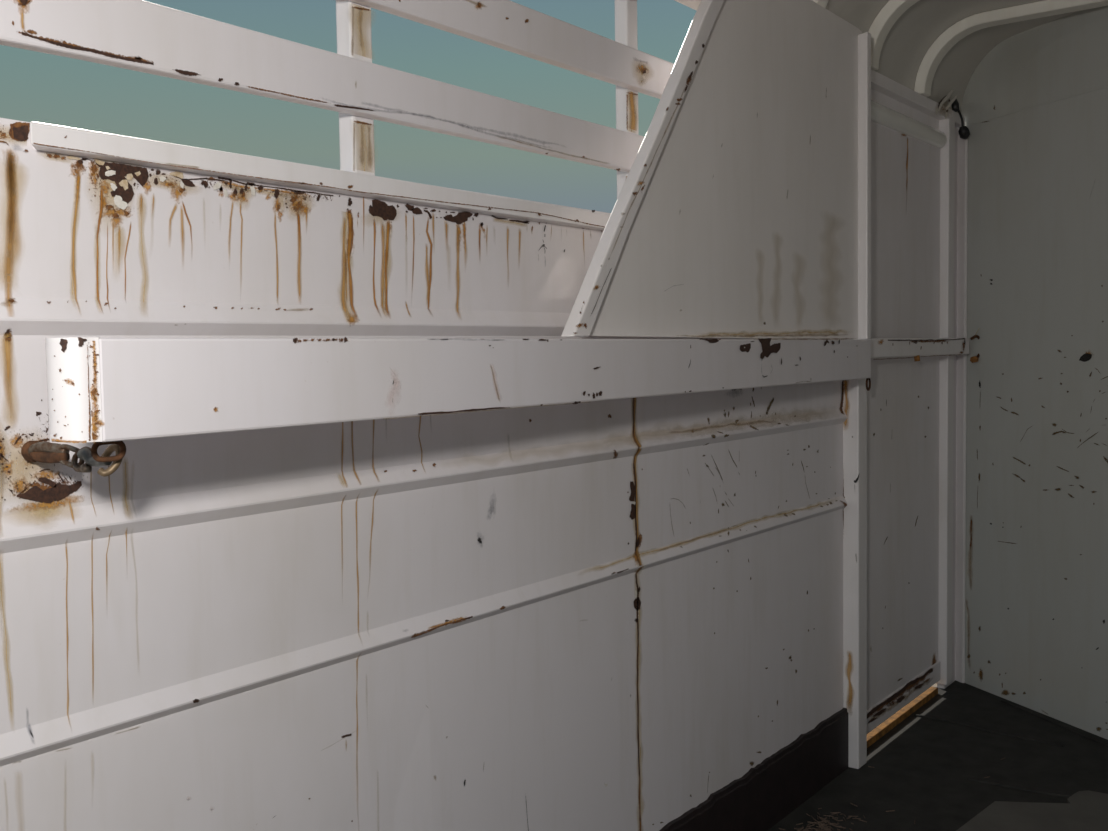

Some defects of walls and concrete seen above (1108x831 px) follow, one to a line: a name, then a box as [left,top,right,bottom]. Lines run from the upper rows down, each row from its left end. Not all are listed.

rust [12,0,154,65]
rust [218,78,374,125]
rust [0,122,605,323]
peeling [369,199,479,313]
rust [4,329,12,381]
peeling [740,338,782,365]
rust [0,341,104,520]
rust [342,421,360,483]